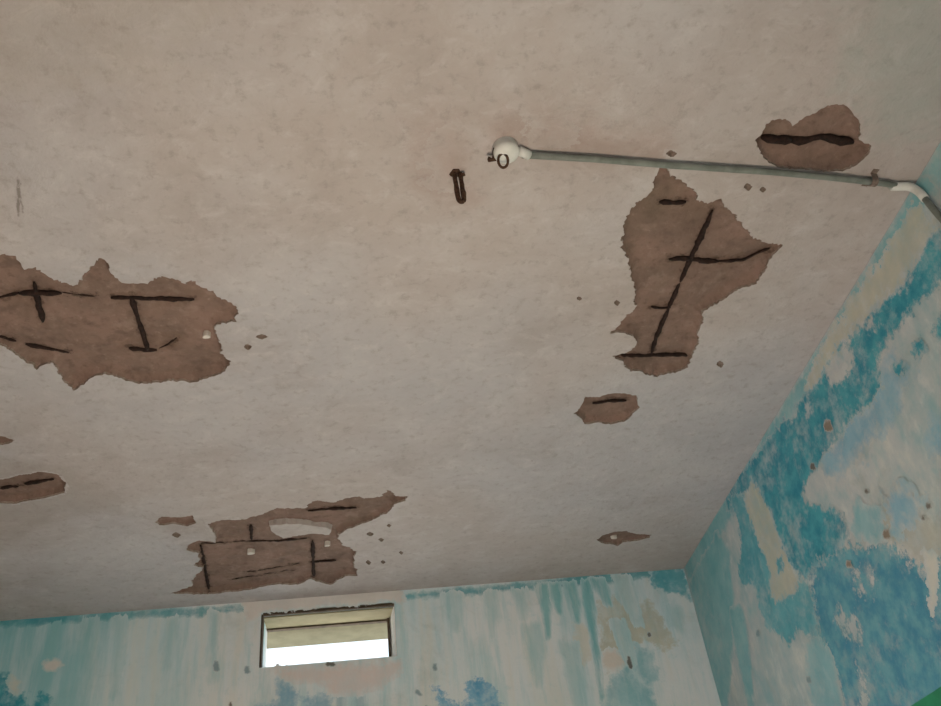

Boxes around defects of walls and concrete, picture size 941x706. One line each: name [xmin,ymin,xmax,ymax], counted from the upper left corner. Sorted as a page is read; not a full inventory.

rust [393,76,684,220]
spalling [755,104,871,172]
spalling [610,168,783,377]
spalling [0,254,239,390]
spalling [573,393,640,425]
spalling [0,472,66,504]
spalling [155,515,196,538]
spalling [173,490,408,595]
spalling [597,531,650,546]